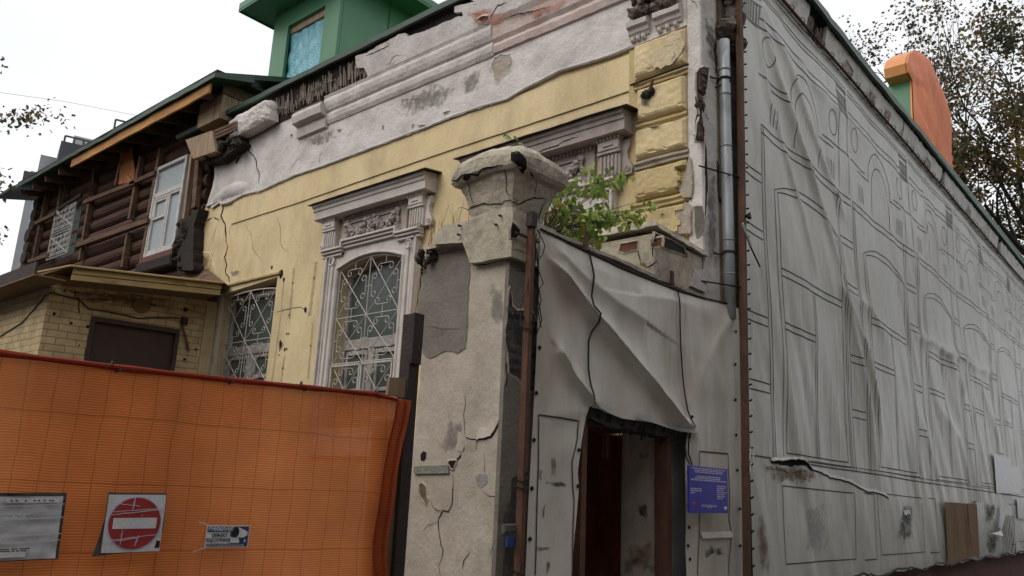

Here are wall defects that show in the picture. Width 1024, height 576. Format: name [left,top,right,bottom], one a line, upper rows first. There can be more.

flaking render [476,14,491,25]
peeling [489,52,515,85]
peeling [651,31,685,69]
crack [452,137,576,223]
crack [203,205,253,283]
crack [421,358,507,572]